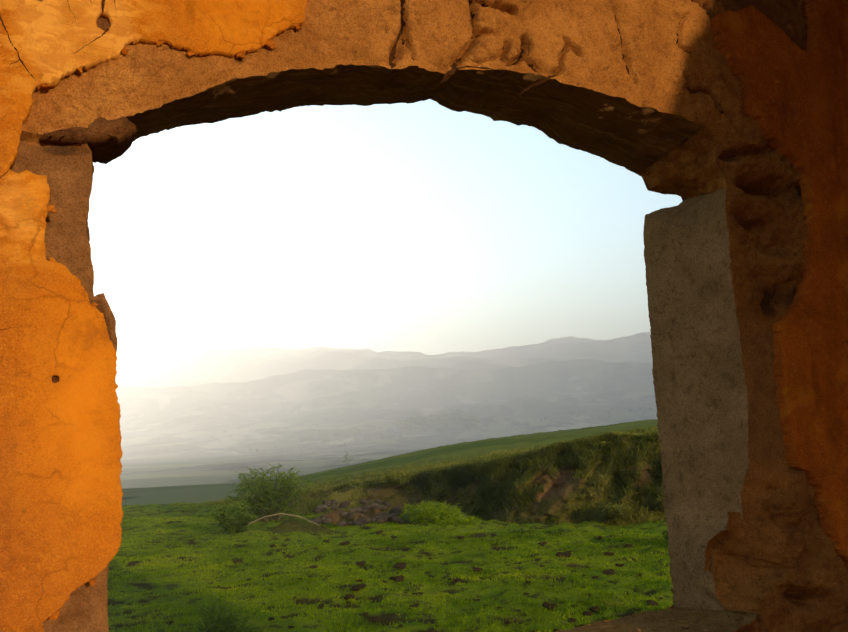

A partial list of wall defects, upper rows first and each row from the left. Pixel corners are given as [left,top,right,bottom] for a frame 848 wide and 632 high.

crack [0,15,34,79]
crack [73,0,116,54]
crack [389,0,414,68]
spalling [10,0,813,470]
spalling [43,564,109,632]